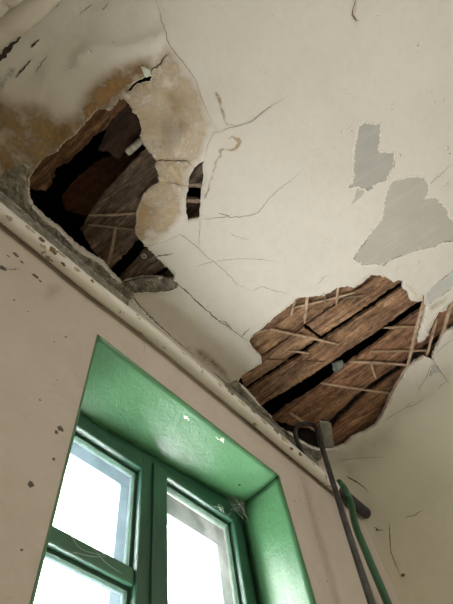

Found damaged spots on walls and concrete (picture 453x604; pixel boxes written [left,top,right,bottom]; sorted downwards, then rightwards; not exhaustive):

flaking render [0,66,161,306]
leakage [0,60,204,237]
crack [121,284,195,357]
flaking render [185,160,205,221]
crack [176,283,249,339]
crack [151,4,289,165]
crack [150,170,302,287]
peeling [225,120,453,467]